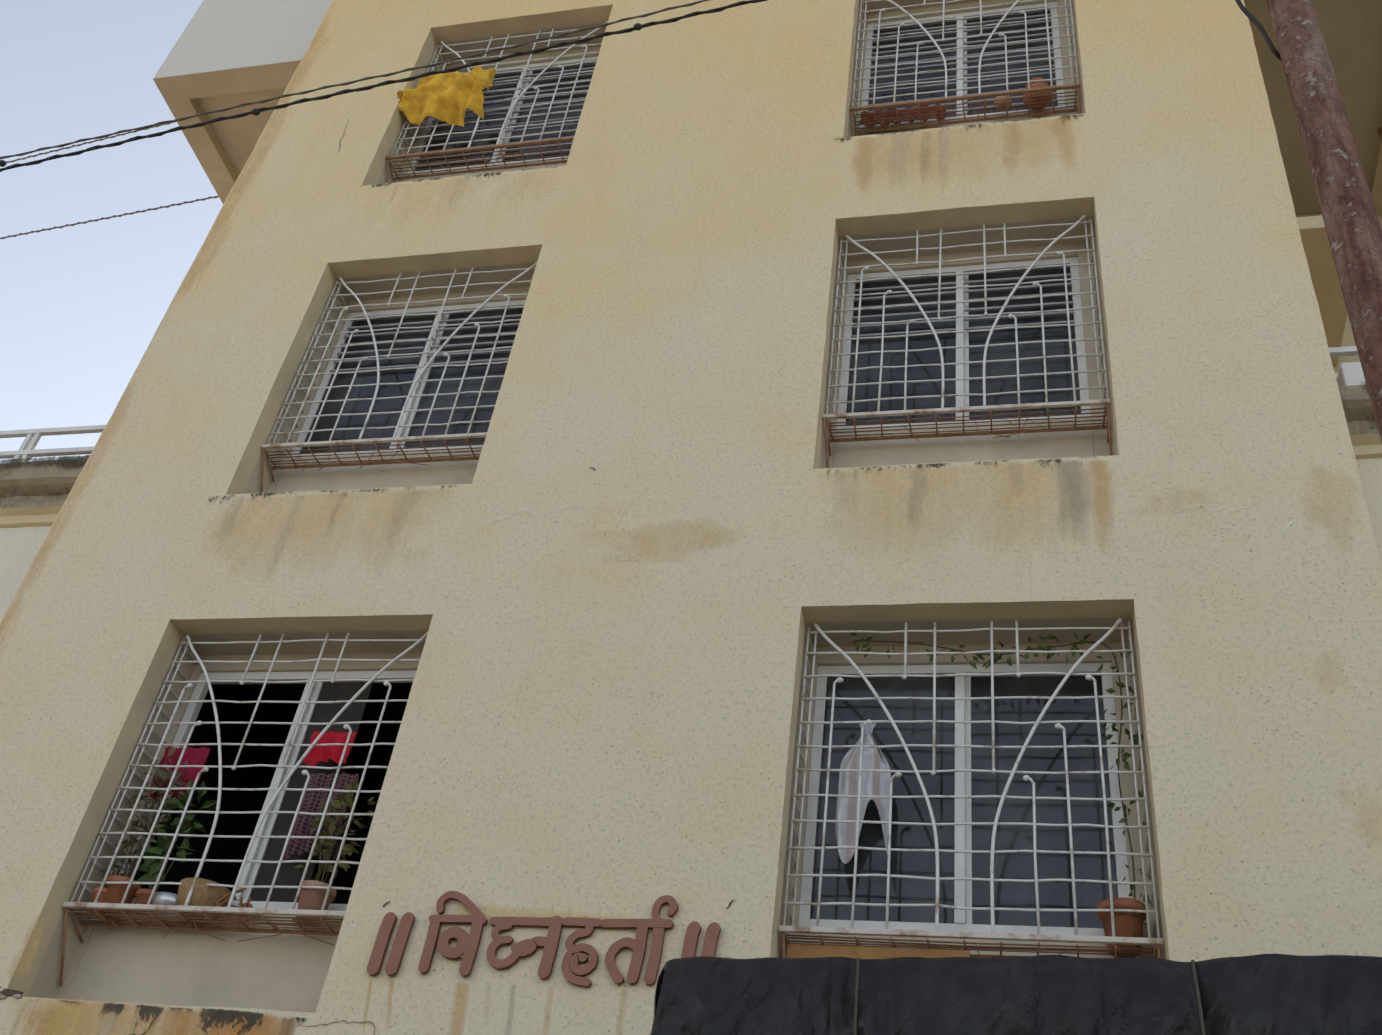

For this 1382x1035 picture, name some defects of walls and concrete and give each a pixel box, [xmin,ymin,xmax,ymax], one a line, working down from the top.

rust [213,1016,292,1035]
crack [299,1020,375,1035]